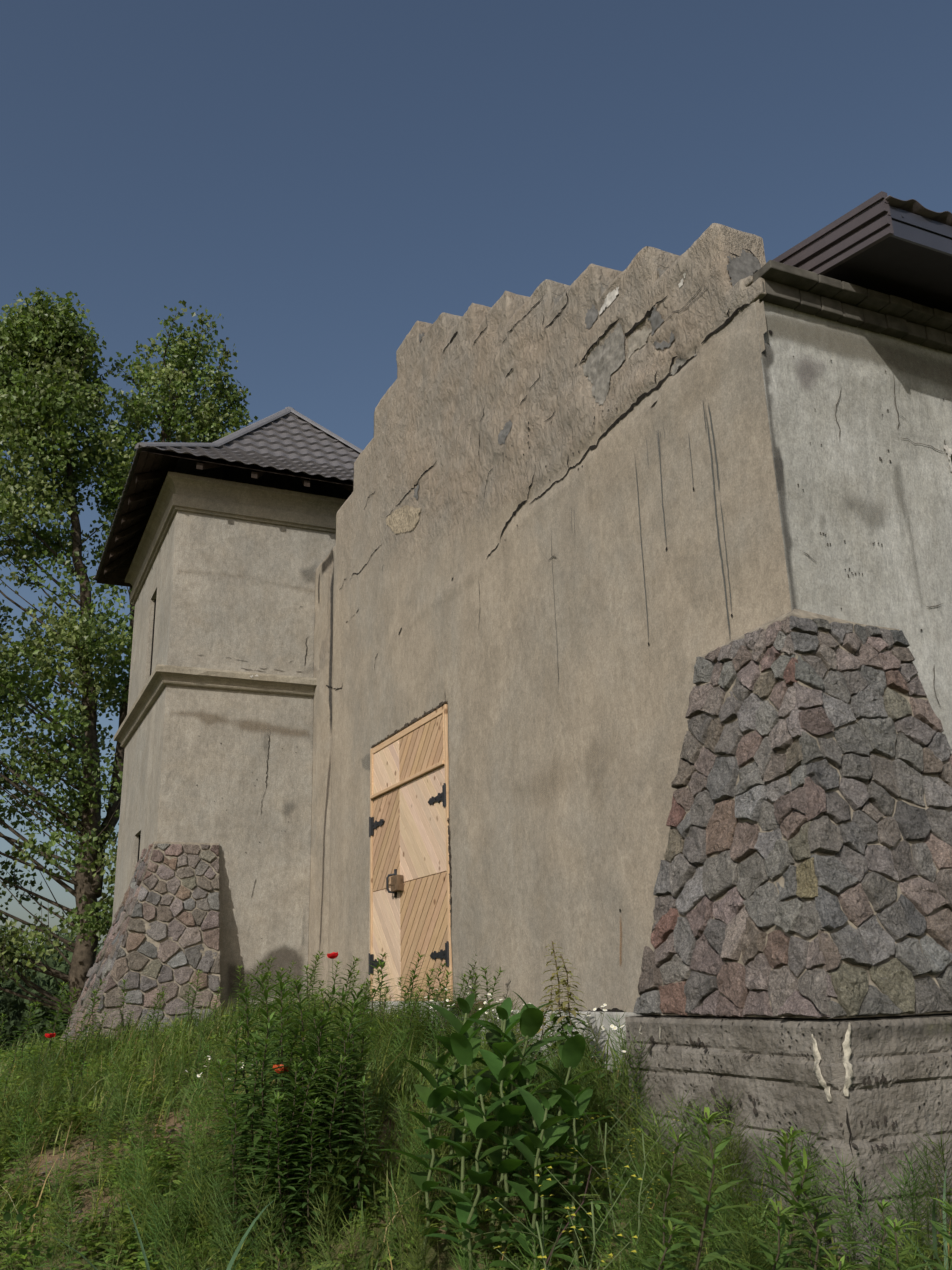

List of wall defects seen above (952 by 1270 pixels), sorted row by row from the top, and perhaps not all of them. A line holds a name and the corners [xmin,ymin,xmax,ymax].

flaking render [585,287,619,330]
flaking render [582,307,697,425]
flaking render [727,248,761,286]
crack [339,462,436,623]
flaking render [386,484,421,534]
crack [443,288,750,627]
leakage [635,465,649,645]
leakage [647,433,667,550]
leakage [703,404,733,634]